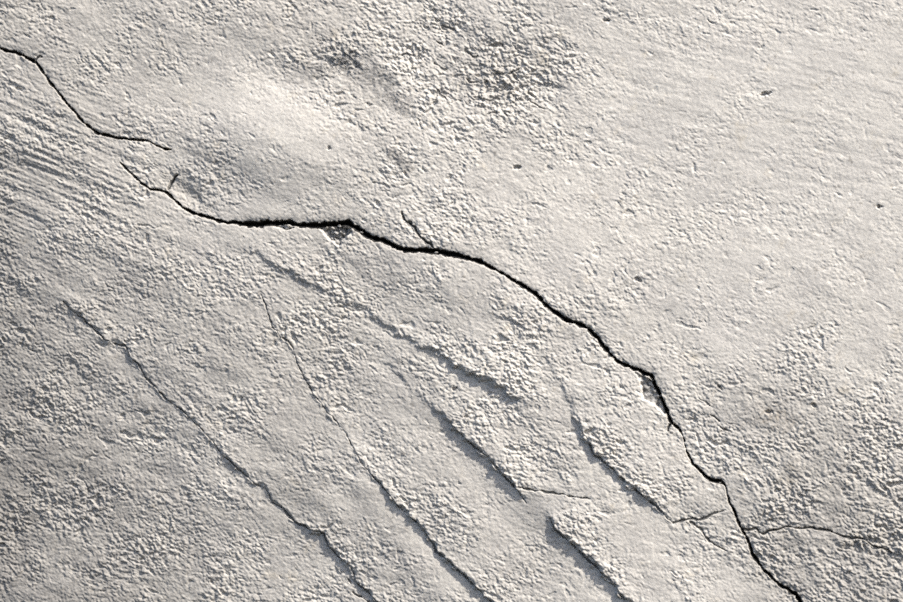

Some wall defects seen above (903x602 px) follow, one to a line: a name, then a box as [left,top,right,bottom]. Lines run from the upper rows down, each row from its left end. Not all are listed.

crack [0,47,172,150]
crack [78,316,203,431]
crack [121,163,892,602]